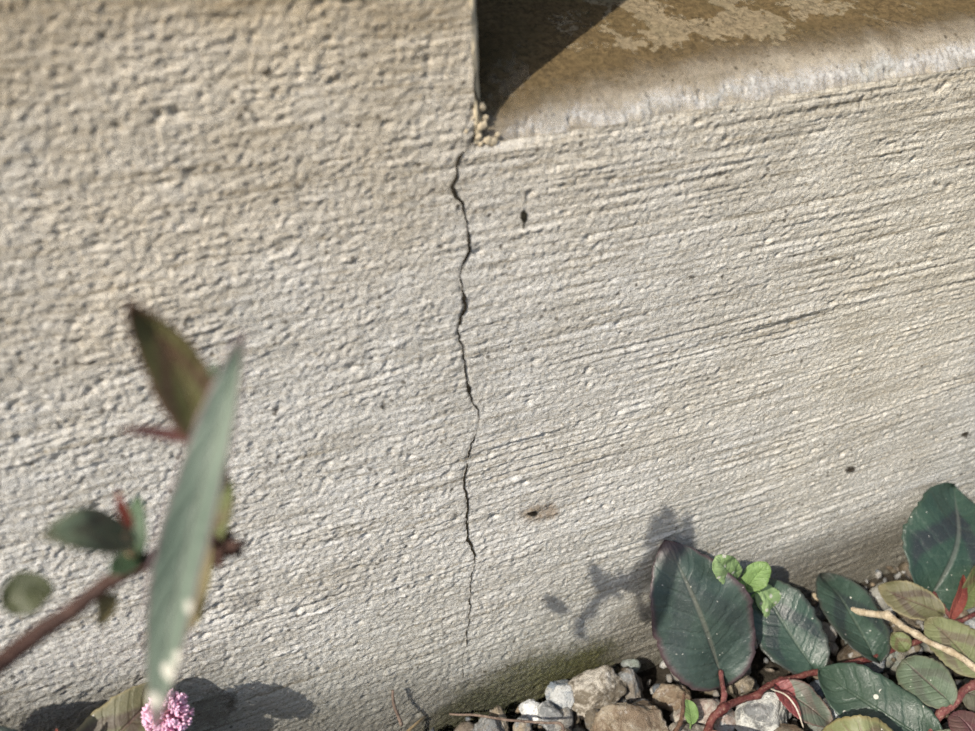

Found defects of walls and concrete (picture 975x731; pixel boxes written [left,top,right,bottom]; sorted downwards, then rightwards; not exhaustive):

peeling [548,0,859,54]
leakage [472,0,975,118]
crack [443,53,485,673]